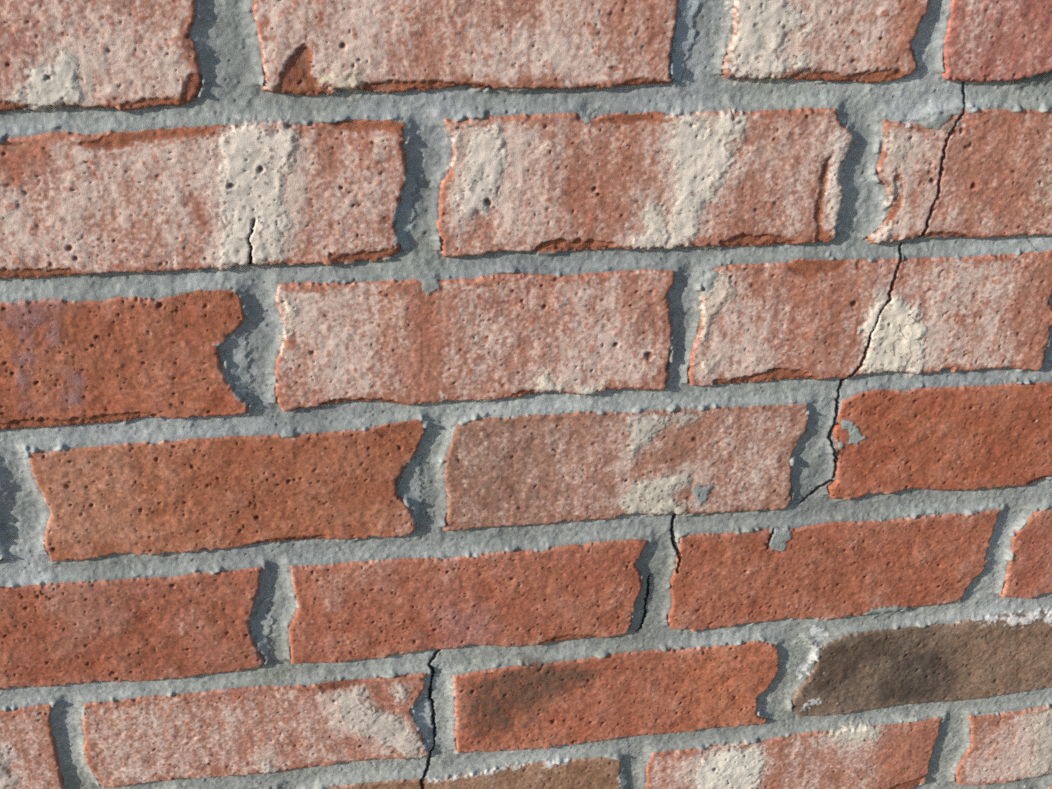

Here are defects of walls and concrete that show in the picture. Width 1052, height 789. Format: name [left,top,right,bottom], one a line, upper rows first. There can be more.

crack [800,81,965,503]
crack [671,513,681,573]
crack [636,574,651,631]
efflorescence [980,608,1052,628]
efflorescence [790,625,829,680]
crack [421,649,441,789]